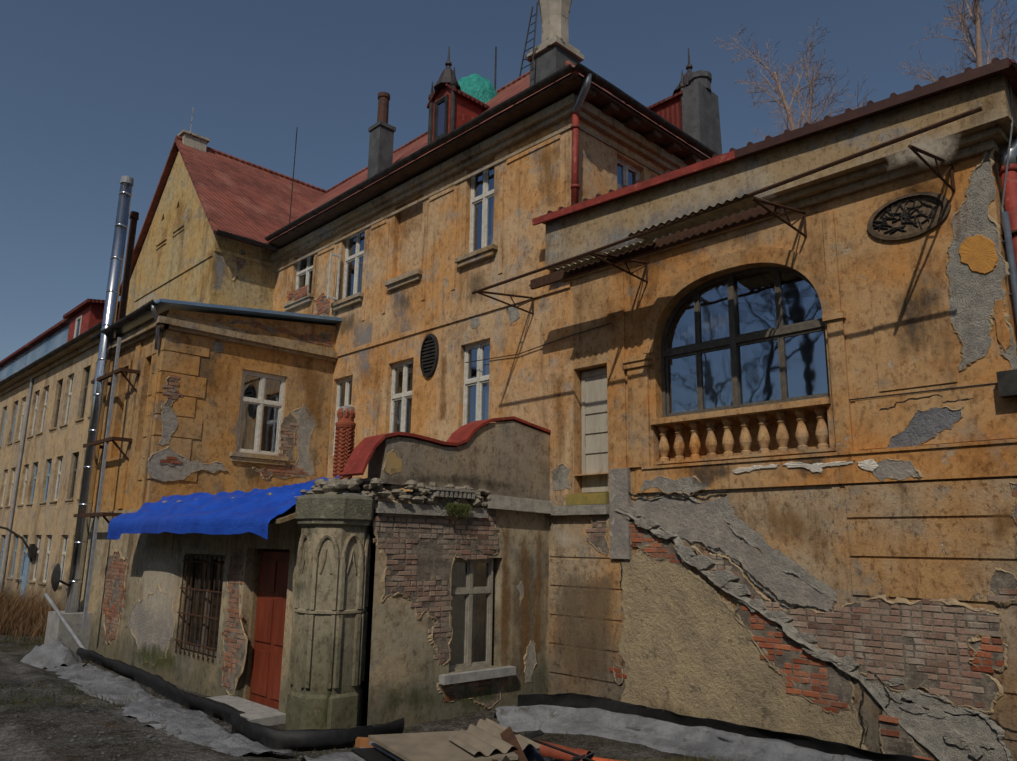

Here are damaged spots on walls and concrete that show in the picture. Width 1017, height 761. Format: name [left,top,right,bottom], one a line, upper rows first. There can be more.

peeling [946,147,1017,372]
peeling [147,375,228,482]
peeling [252,405,317,481]
peeling [733,406,965,481]
flaking render [220,548,248,696]
flaking render [373,497,499,666]
peeling [586,475,1017,761]
flaking render [437,678,506,711]
crack [858,671,1017,749]